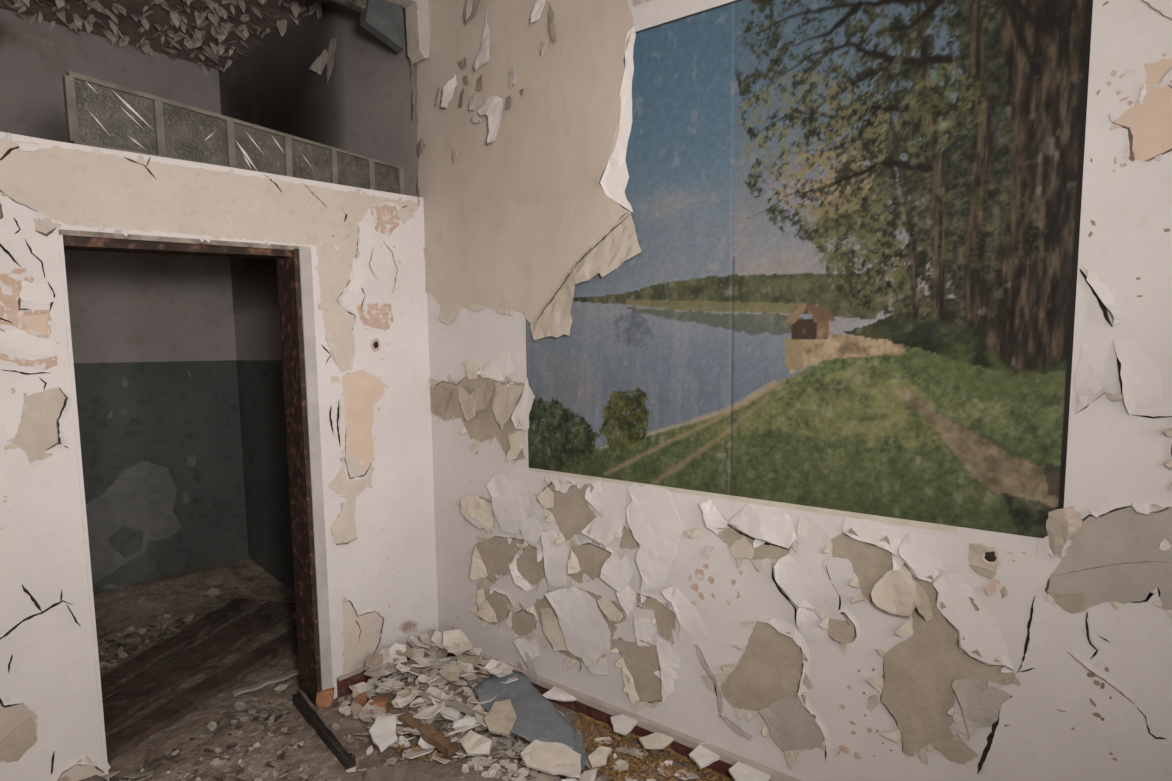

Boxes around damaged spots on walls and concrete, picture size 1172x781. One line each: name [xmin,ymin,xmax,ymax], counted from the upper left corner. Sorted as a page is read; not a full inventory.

peeling [1096,53,1172,172]
peeling [0,0,642,549]
peeling [1074,265,1172,470]
peeling [430,351,1172,769]
peeling [0,670,38,763]
crack [0,584,81,673]
peeling [50,751,111,781]
peeling [517,737,699,781]
crack [977,596,1043,779]
crack [1067,612,1166,739]